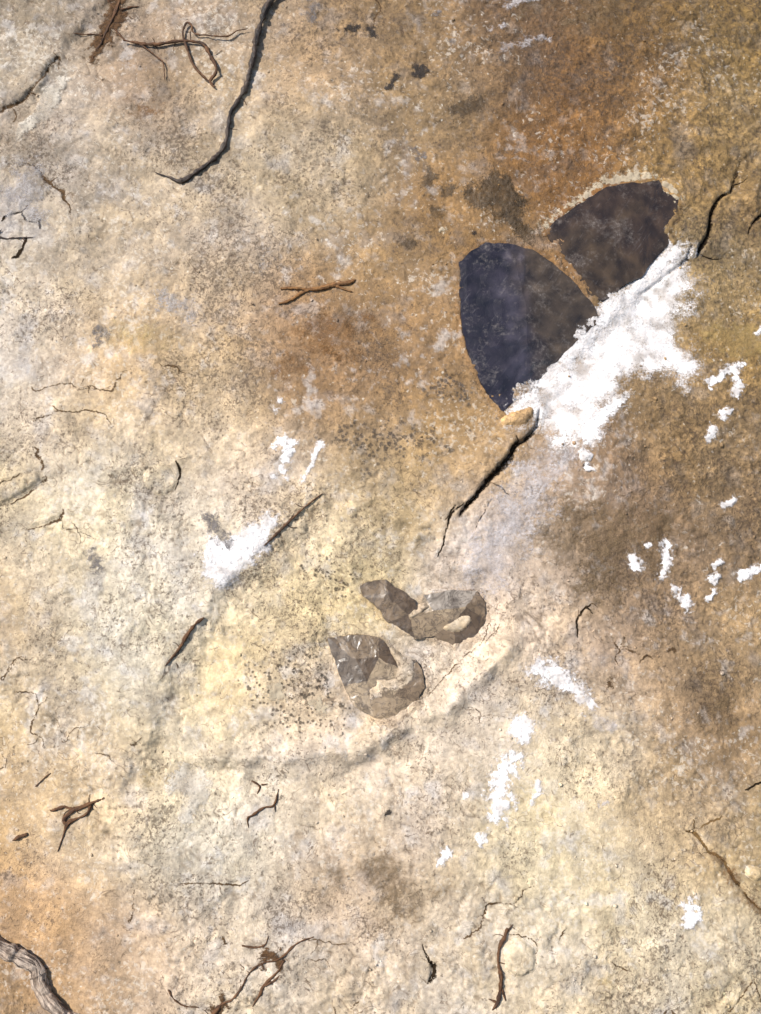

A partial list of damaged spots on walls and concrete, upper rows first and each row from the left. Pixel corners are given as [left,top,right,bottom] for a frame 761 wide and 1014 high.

crack [643,171,750,294]
leakage [506,243,746,471]
crack [437,417,541,557]
crack [181,878,250,894]